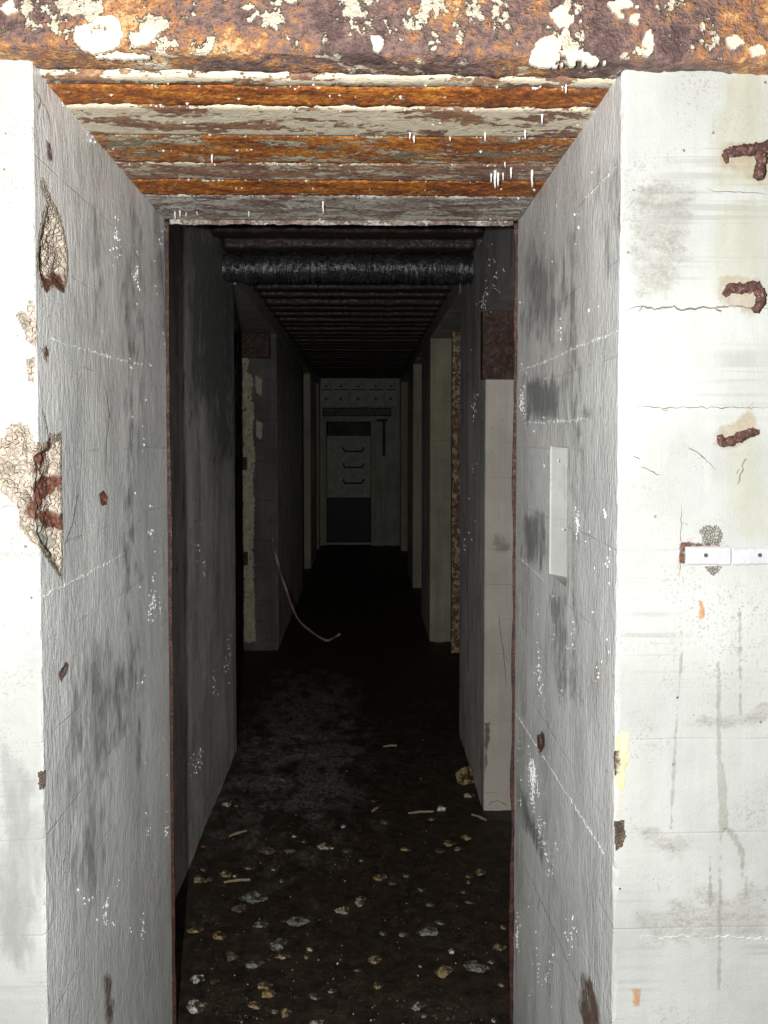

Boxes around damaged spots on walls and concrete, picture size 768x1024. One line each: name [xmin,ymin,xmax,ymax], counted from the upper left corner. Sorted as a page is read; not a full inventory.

peeling [74,15,161,61]
peeling [528,5,606,69]
rust [49,84,609,109]
rust [92,134,575,165]
rust [131,179,545,197]
spalling [36,176,69,293]
crack [630,304,768,312]
water stain [527,377,557,421]
spalling [0,422,63,579]
water stain [521,517,545,568]
water stain [86,664,124,758]
rust [580,974,599,1024]